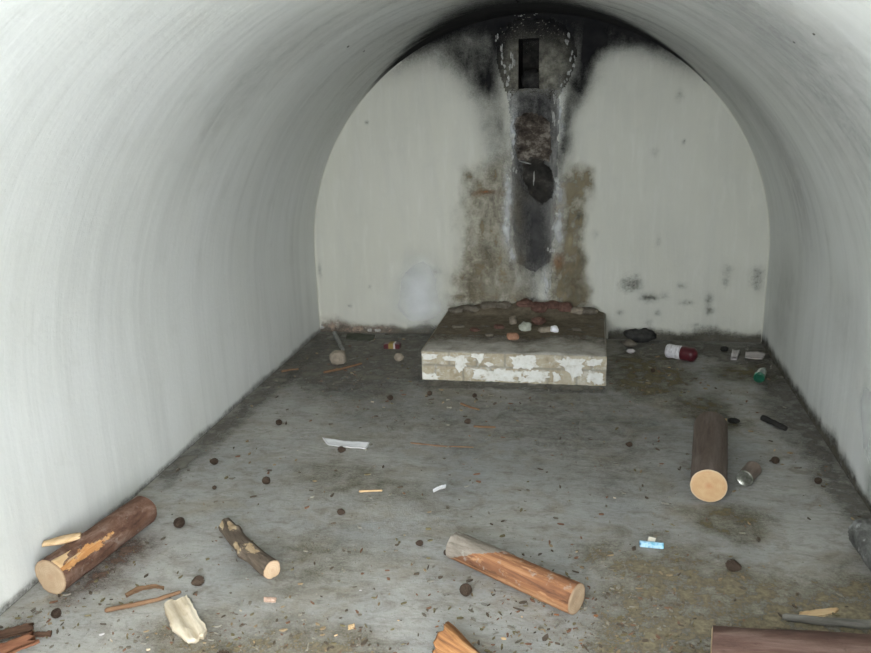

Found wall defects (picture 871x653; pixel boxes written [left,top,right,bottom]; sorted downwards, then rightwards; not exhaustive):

flaking render [495,13,576,294]
damp [457,169,526,303]
damp [551,169,593,307]
peeling [422,353,604,385]